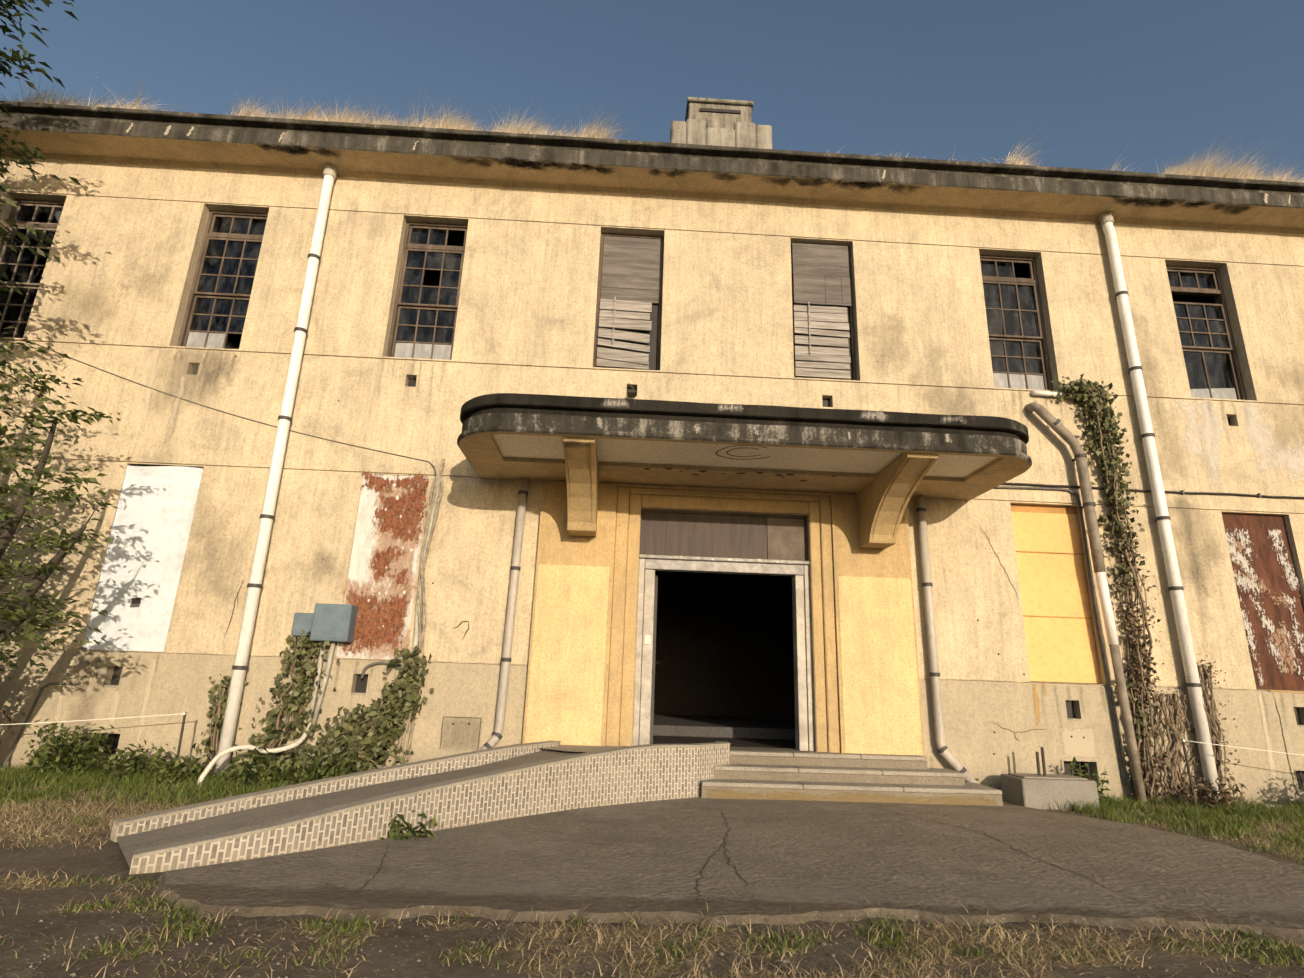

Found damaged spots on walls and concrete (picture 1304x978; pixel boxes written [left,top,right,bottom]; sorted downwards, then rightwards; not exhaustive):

corrosion [342,469,429,658]
corrosion [1227,541,1290,607]
corrosion [1269,624,1302,675]
crack [347,844,389,902]
crack [694,803,765,912]